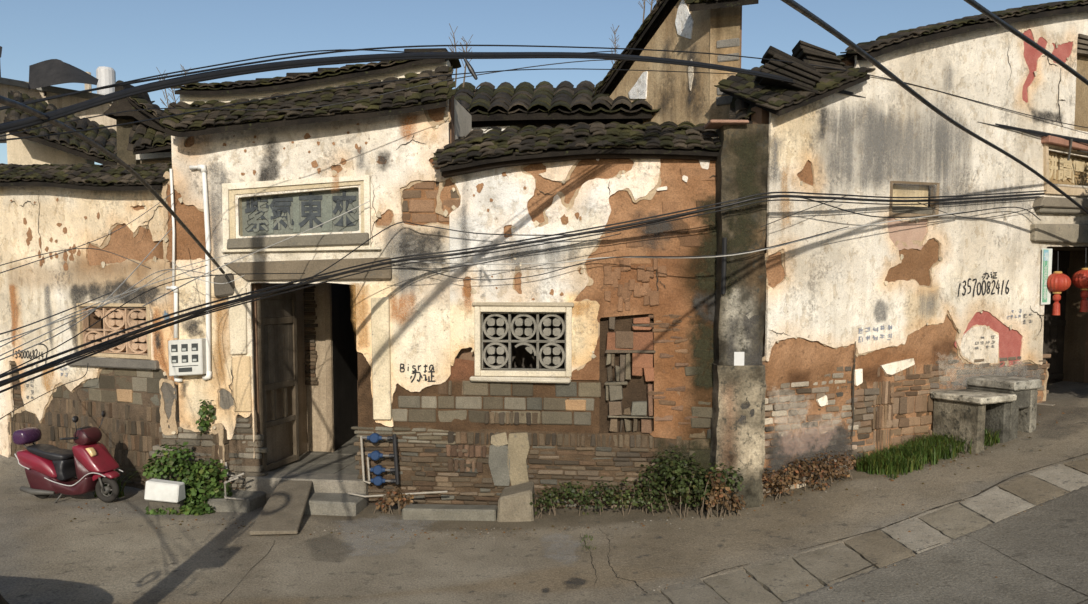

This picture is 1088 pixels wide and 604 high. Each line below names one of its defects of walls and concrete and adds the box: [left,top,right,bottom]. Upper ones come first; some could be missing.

peeling [1021,28,1073,103]
flaking render [23,171,206,271]
water stain [727,136,761,270]
flaking render [797,161,814,186]
flaking render [884,218,943,288]
water stain [820,108,1013,210]
flaking render [351,156,716,509]
water stain [728,313,762,365]
flaking render [762,310,1051,498]
crack [580,528,647,593]
crack [961,533,1088,604]